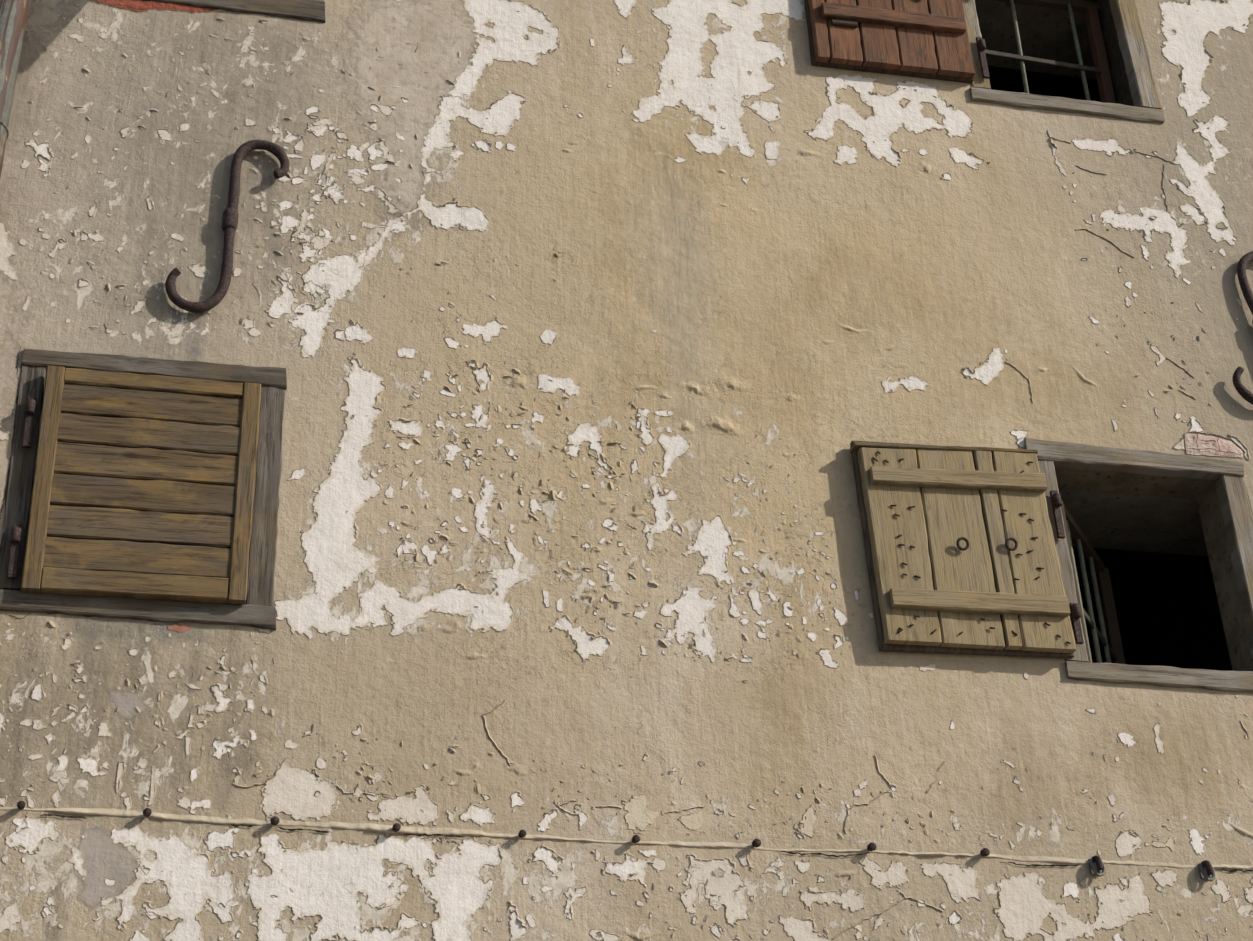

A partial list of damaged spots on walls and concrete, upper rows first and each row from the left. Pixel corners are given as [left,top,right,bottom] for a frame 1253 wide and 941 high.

peeling [804,74,991,181]
crack [1135,151,1175,212]
peeling [0,0,874,669]
peeling [1116,257,1174,339]
flaking render [1147,335,1251,462]
peeling [0,629,1253,941]